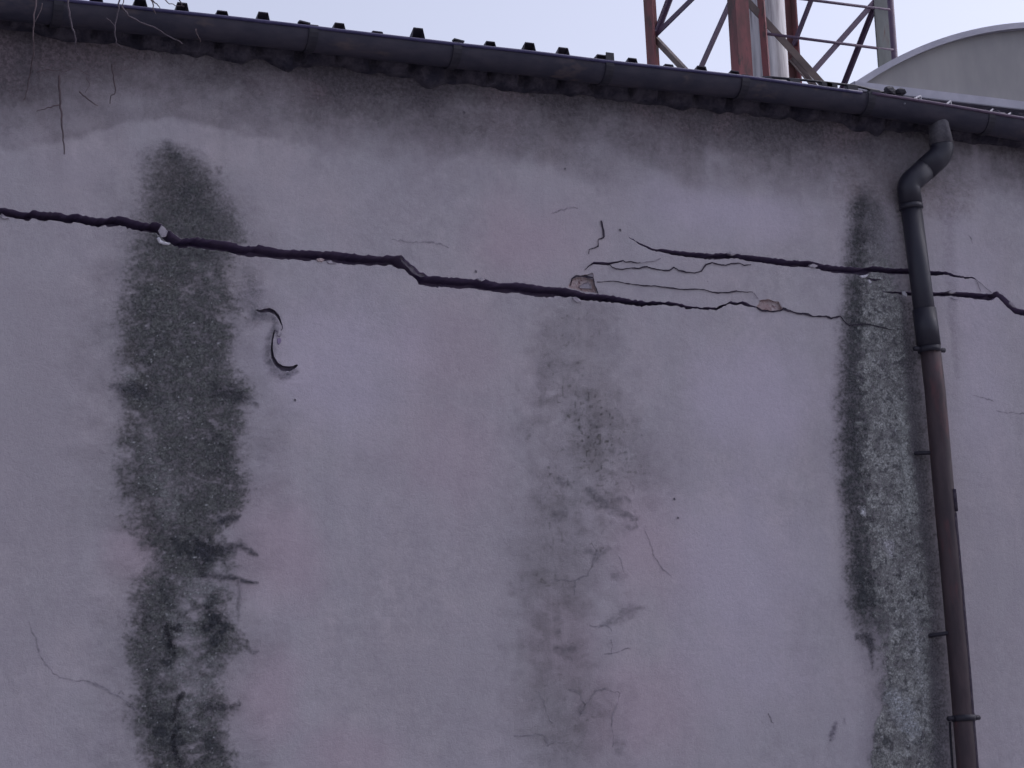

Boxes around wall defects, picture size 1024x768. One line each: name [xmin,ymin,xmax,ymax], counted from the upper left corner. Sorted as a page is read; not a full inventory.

leakage [0,29,930,184]
crack [257,308,298,371]
crack [0,208,1024,316]
flaking render [568,273,598,293]
flaking render [756,299,783,312]
crack [782,307,891,330]
leakage [116,149,257,768]
leakage [835,196,948,768]